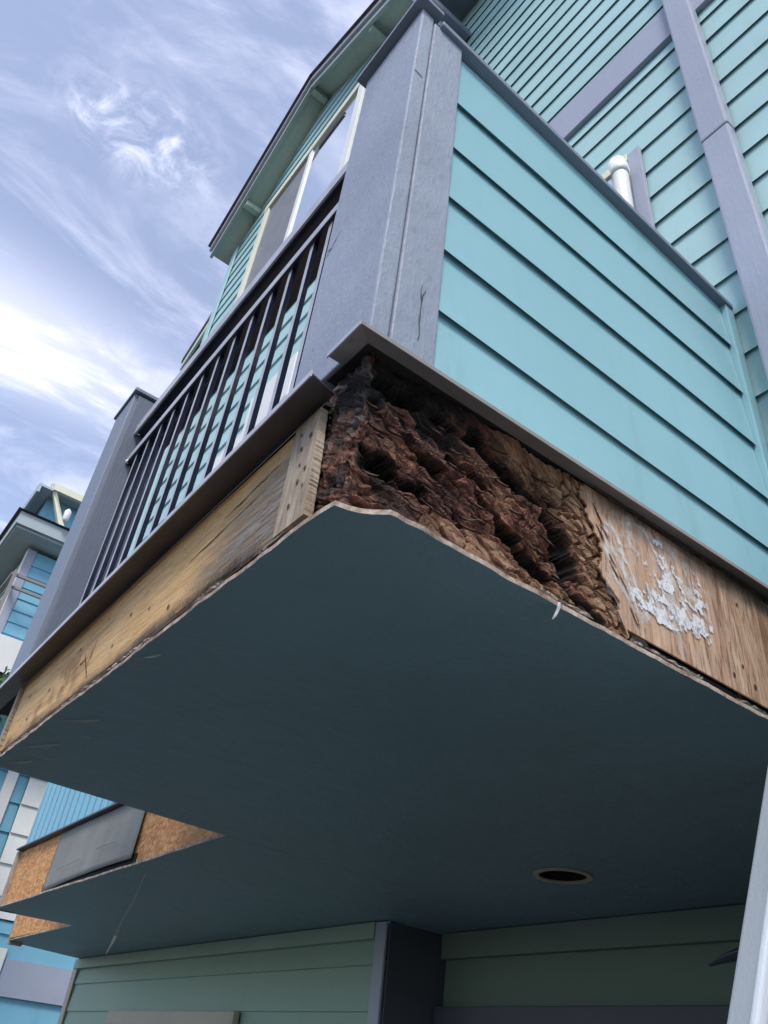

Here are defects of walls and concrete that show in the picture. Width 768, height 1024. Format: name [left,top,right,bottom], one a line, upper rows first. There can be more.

crack [417,285,426,340]
damp [599,490,768,657]